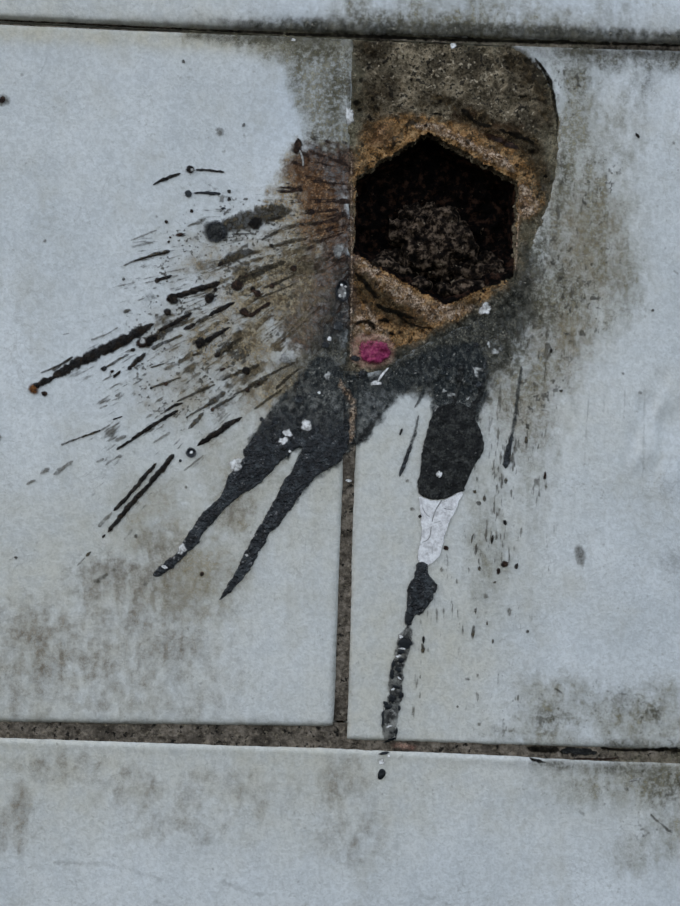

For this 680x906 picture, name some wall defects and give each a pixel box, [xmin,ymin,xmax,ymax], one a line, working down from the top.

leakage [234,0,680,158]
leakage [471,69,613,525]
leakage [399,385,426,482]
leakage [468,525,518,583]